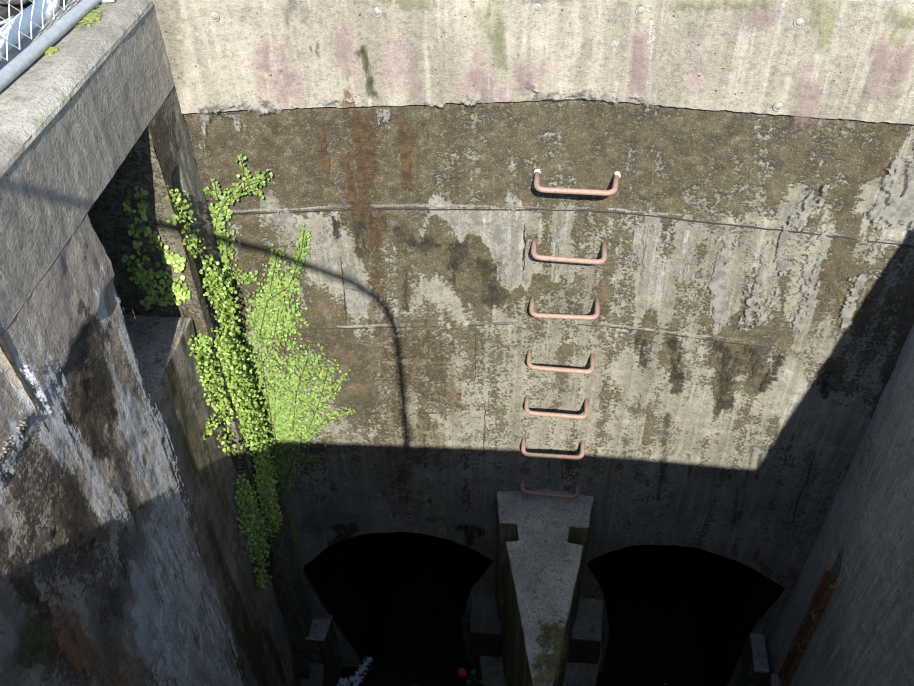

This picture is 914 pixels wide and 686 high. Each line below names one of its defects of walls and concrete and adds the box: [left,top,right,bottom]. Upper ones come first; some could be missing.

water stain [331,216,341,239]
water stain [352,211,511,313]
crack [0,335,50,432]
water stain [635,335,651,368]
water stain [668,337,686,395]
water stain [707,341,786,410]
water stain [812,371,833,399]
water stain [0,428,25,505]
water stain [20,294,247,686]
water stain [0,527,53,668]